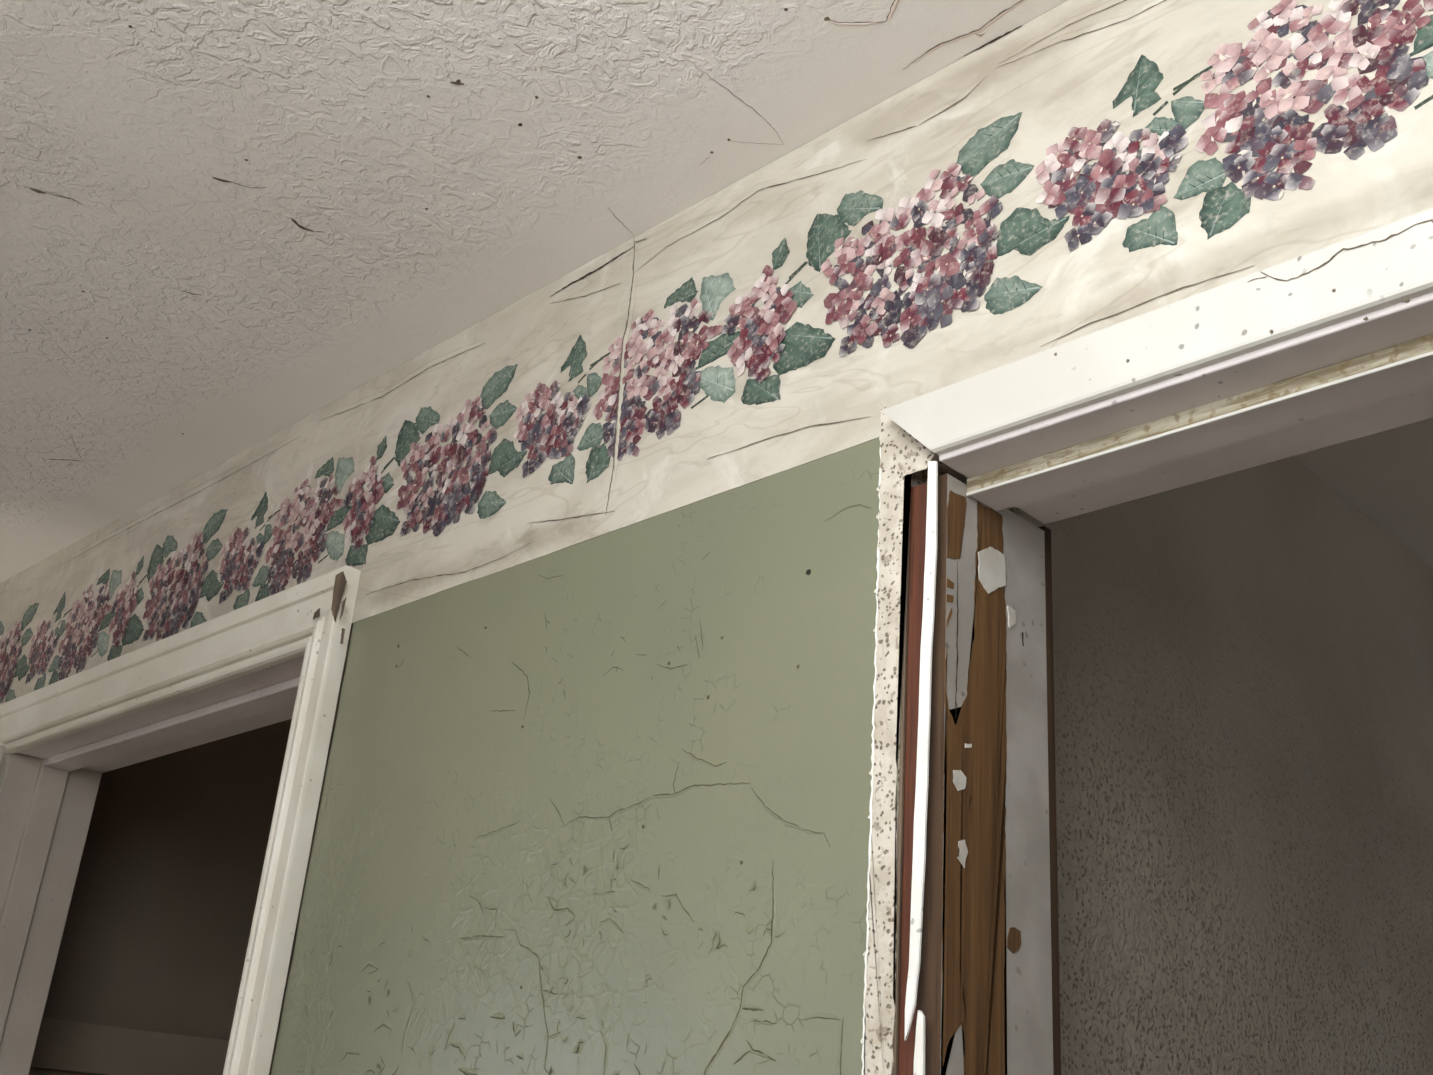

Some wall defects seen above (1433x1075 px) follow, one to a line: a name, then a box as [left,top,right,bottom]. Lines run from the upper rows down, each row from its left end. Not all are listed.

crack [903,0,1027,70]
crack [1248,219,1433,282]
crack [604,623,703,675]
crack [490,661,565,718]
flaking render [860,404,935,1075]
crack [550,750,830,846]
peeling [940,490,1021,1075]
crack [547,879,694,933]
crack [459,895,560,1075]
crack [704,860,843,1075]
crack [599,1030,640,1075]